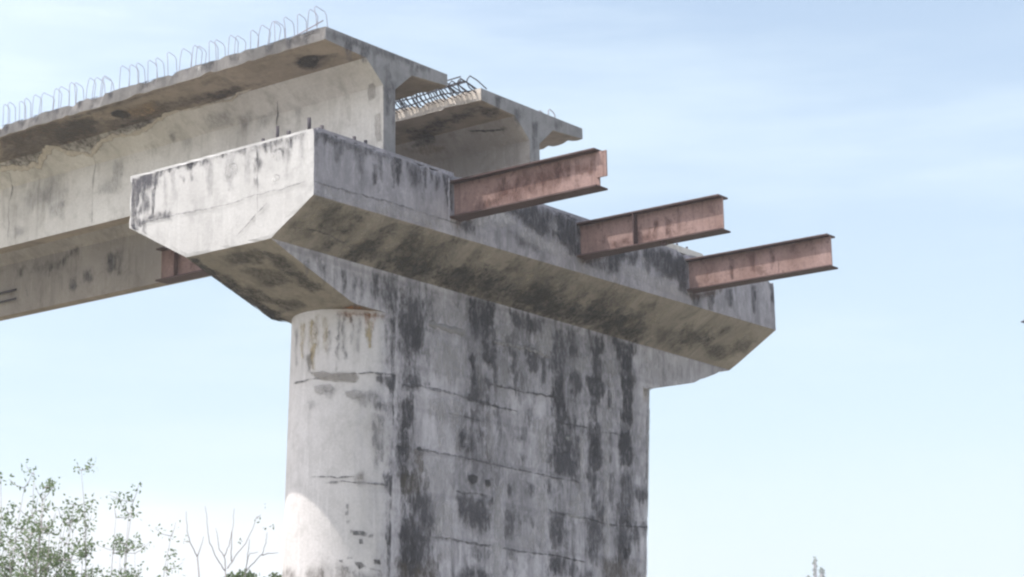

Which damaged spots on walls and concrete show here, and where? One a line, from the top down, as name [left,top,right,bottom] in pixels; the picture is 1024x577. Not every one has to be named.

water stain [131,159,207,231]
water stain [504,205,733,306]
rust [340,306,376,347]
water stain [294,205,666,577]